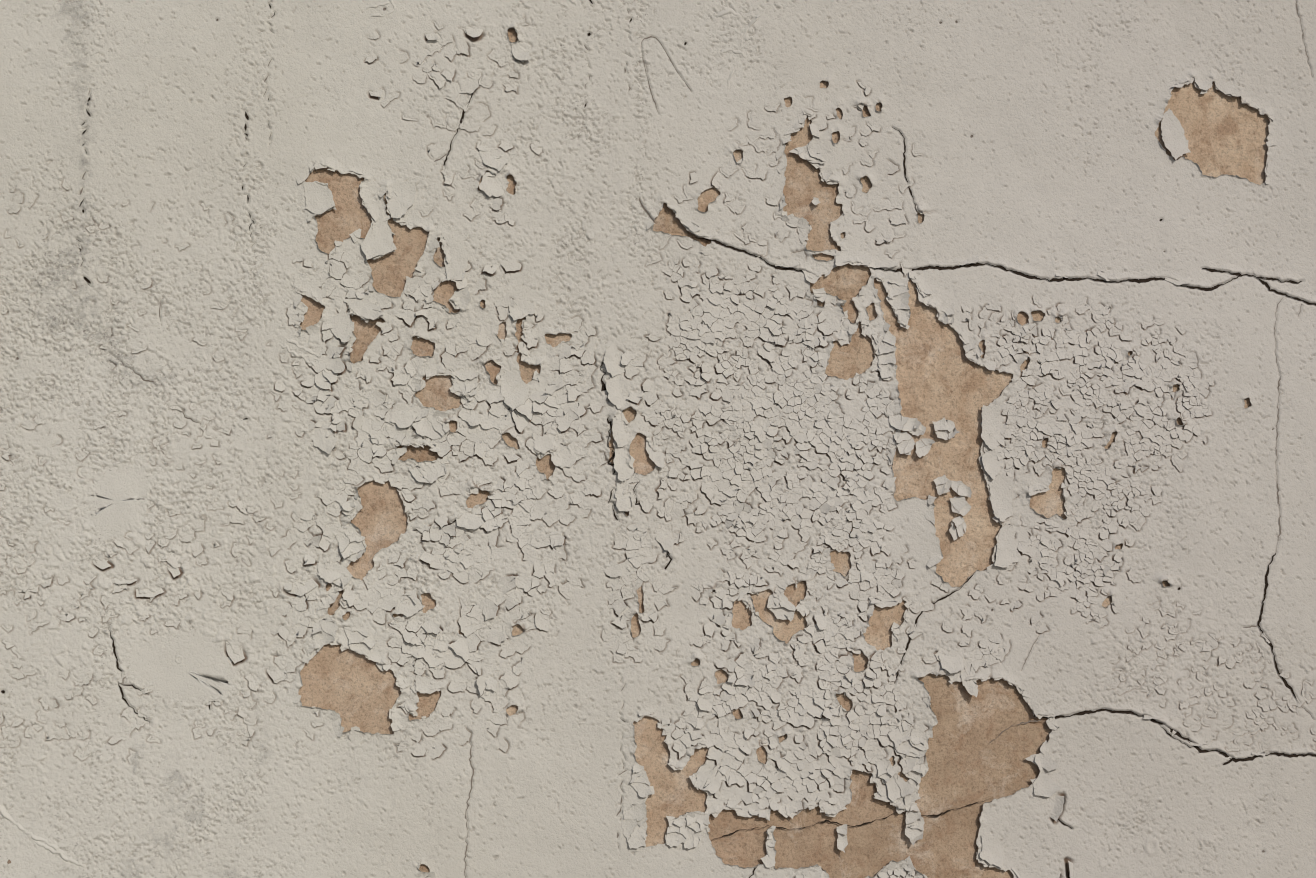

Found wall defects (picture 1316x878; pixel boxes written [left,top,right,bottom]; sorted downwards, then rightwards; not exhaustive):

peeling [399,18,531,225]
peeling [1155,74,1275,185]
crack [693,235,804,273]
crack [600,362,641,520]
peeling [267,81,1214,878]
crack [874,255,1316,720]
peeling [93,557,164,598]
crack [990,709,1316,765]
crack [464,739,474,877]
crack [711,801,984,841]